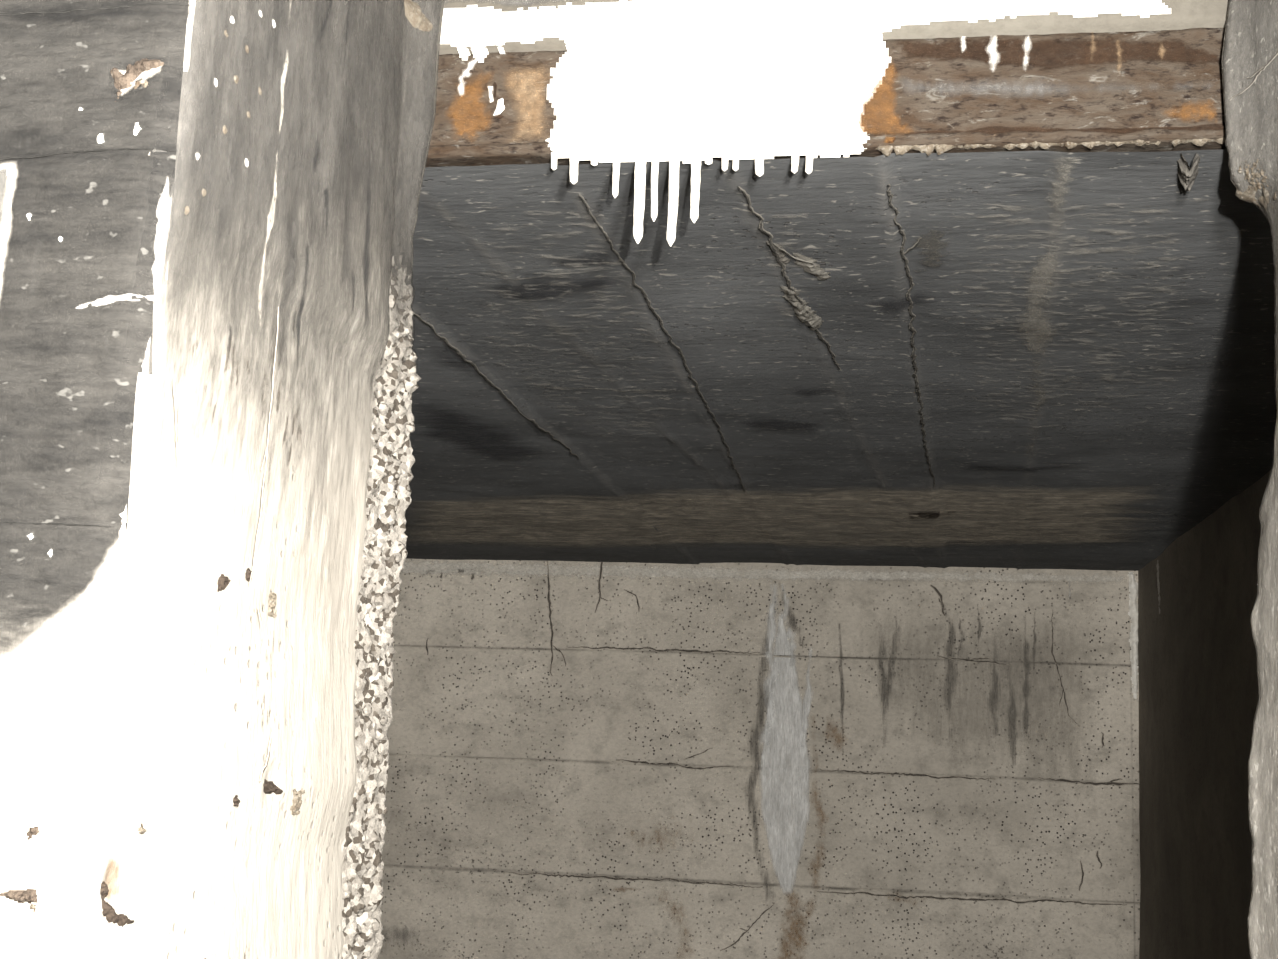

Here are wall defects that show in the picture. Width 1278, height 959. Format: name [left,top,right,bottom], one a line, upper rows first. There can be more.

spalling [488,82,505,118]
crack [578,194,745,492]
crack [737,186,841,370]
crack [887,184,935,486]
crack [547,561,760,676]
damp [402,561,1139,894]